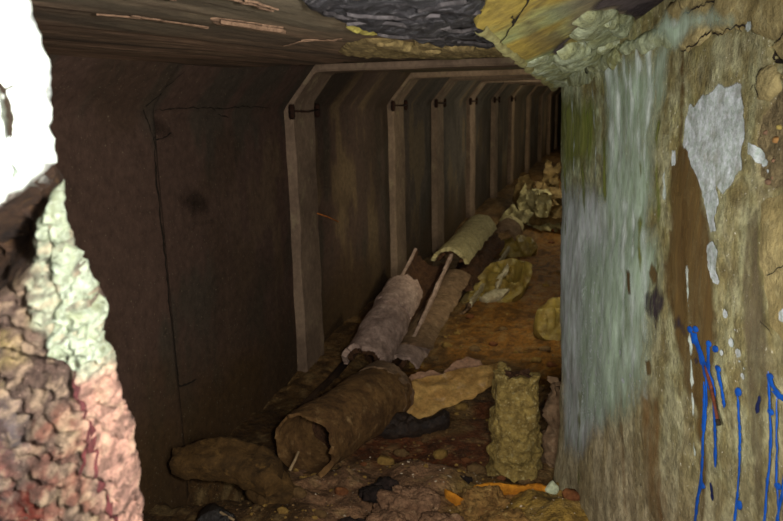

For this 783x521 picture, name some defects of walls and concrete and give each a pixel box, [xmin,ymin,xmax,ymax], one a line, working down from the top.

spalling [302,0,558,91]
leakage [660,14,718,46]
crack [681,0,715,17]
crack [680,24,746,68]
crack [143,73,271,387]
leakage [560,51,666,449]
crack [72,366,118,521]